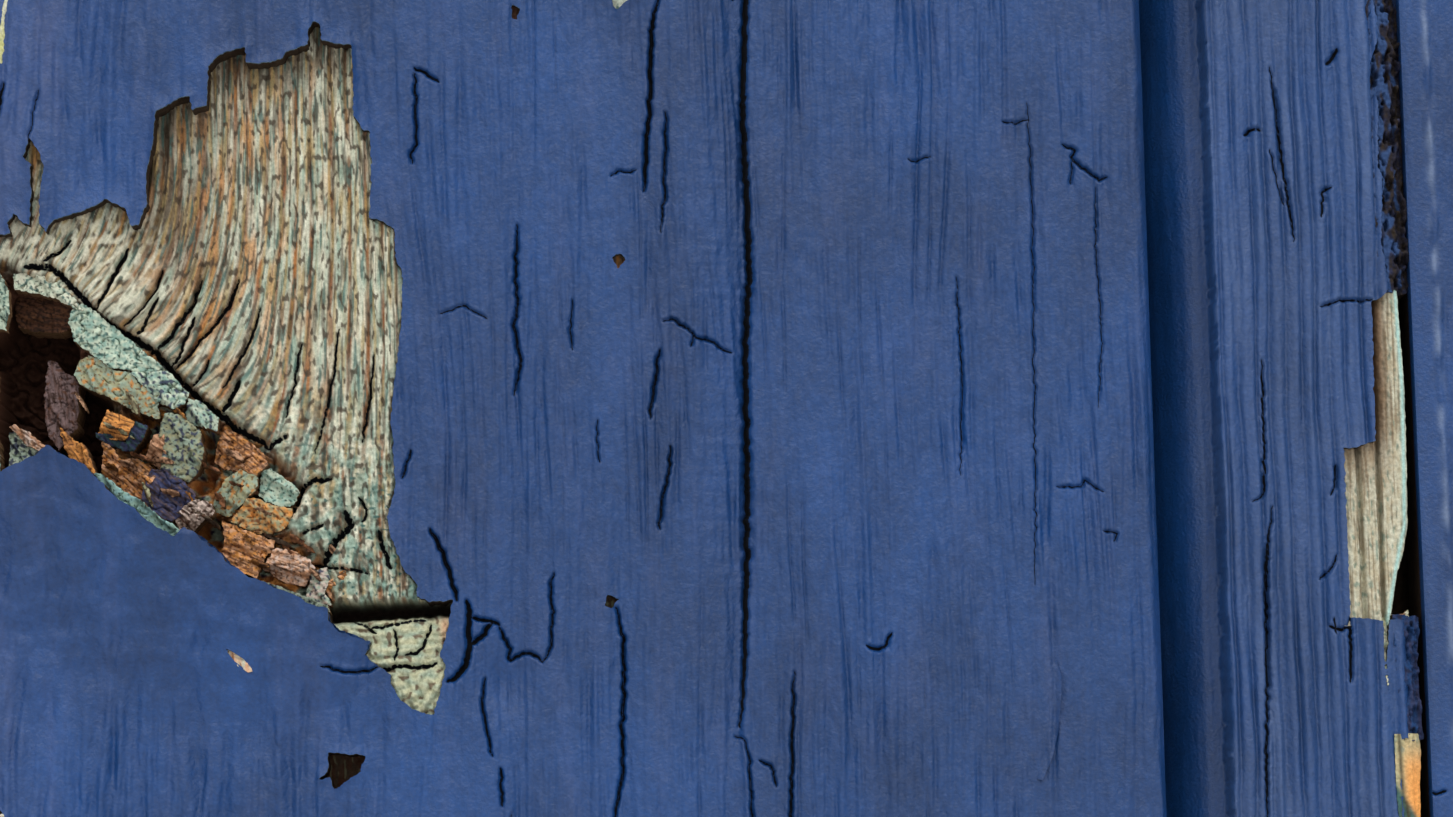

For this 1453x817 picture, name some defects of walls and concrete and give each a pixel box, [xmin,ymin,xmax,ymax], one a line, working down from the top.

peeling [0,27,452,715]
peeling [1344,0,1424,817]
peeling [326,755,365,789]
crack [320,665,378,673]
crack [429,528,555,816]